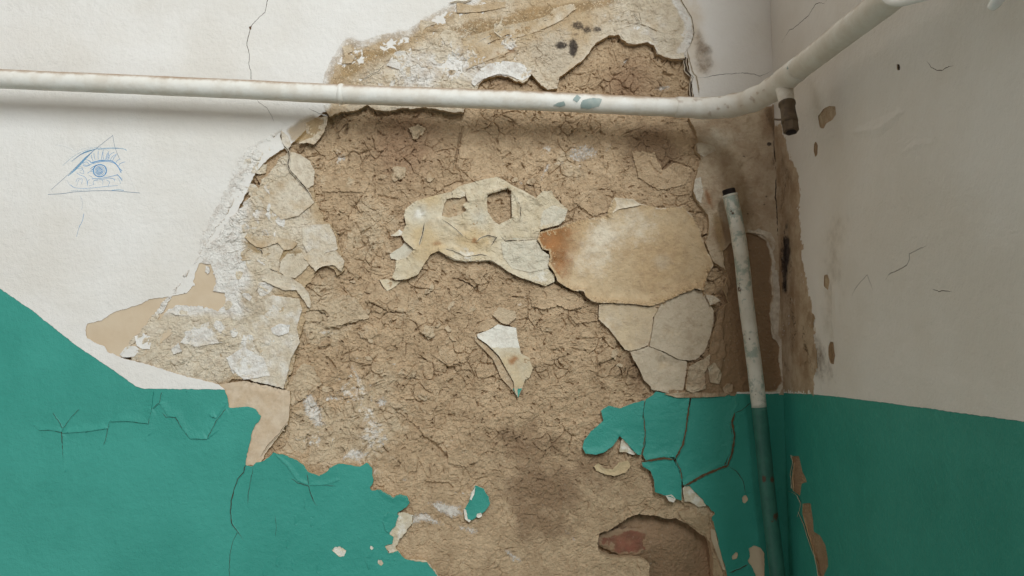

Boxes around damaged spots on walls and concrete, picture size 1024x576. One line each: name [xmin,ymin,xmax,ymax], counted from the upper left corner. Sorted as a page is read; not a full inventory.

crack [246,0,275,123]
peeling [819,106,836,128]
flaking render [31,0,764,576]
leakage [665,104,818,398]
crack [853,245,927,293]
crack [39,430,64,464]
crack [228,465,254,576]
crack [291,475,334,506]
crack [643,402,751,494]
peeling [788,455,828,576]